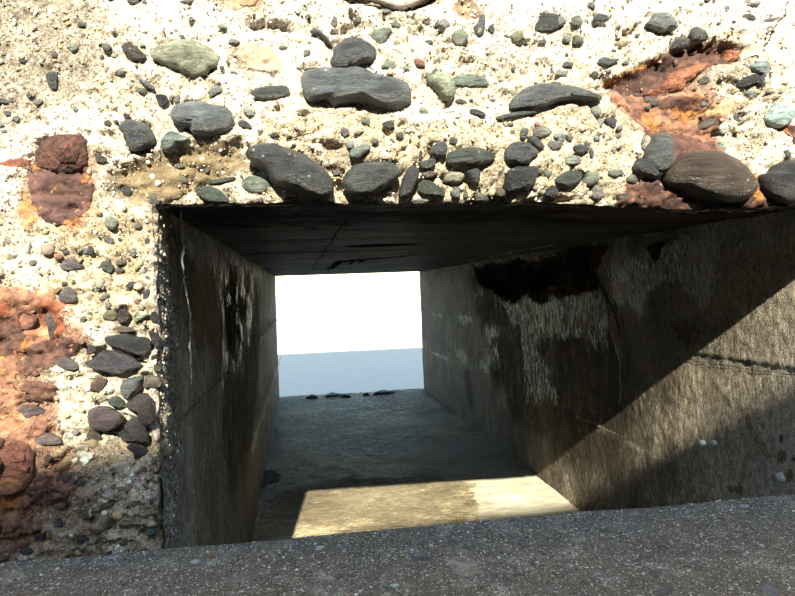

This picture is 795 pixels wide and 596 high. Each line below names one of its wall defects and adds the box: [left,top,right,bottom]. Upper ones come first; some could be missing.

crack [757,0,789,80]
corrosion [604,50,748,157]
corrosion [780,125,795,143]
corrosion [0,157,102,233]
corrosion [615,173,773,212]
water stain [113,210,263,391]
spalling [475,245,591,302]
corrosion [0,282,93,447]
water stain [502,211,795,484]
corrosion [0,466,81,543]